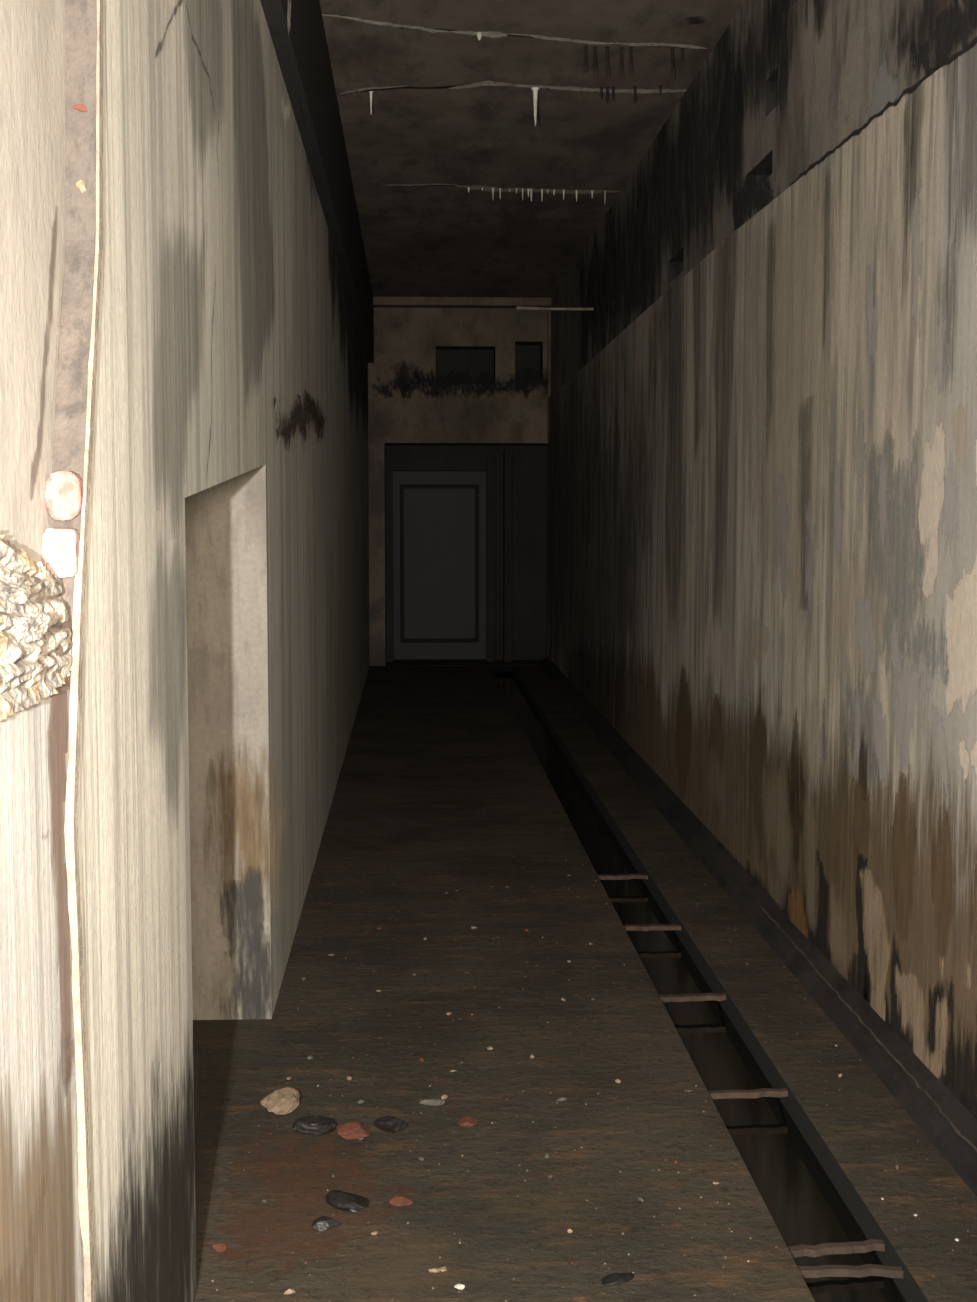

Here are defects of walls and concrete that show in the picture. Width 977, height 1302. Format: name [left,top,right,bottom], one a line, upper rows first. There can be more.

crack [789,36,977,186]
peeling [918,420,977,717]
water stain [568,650,977,1120]
peeling [959,739,977,780]